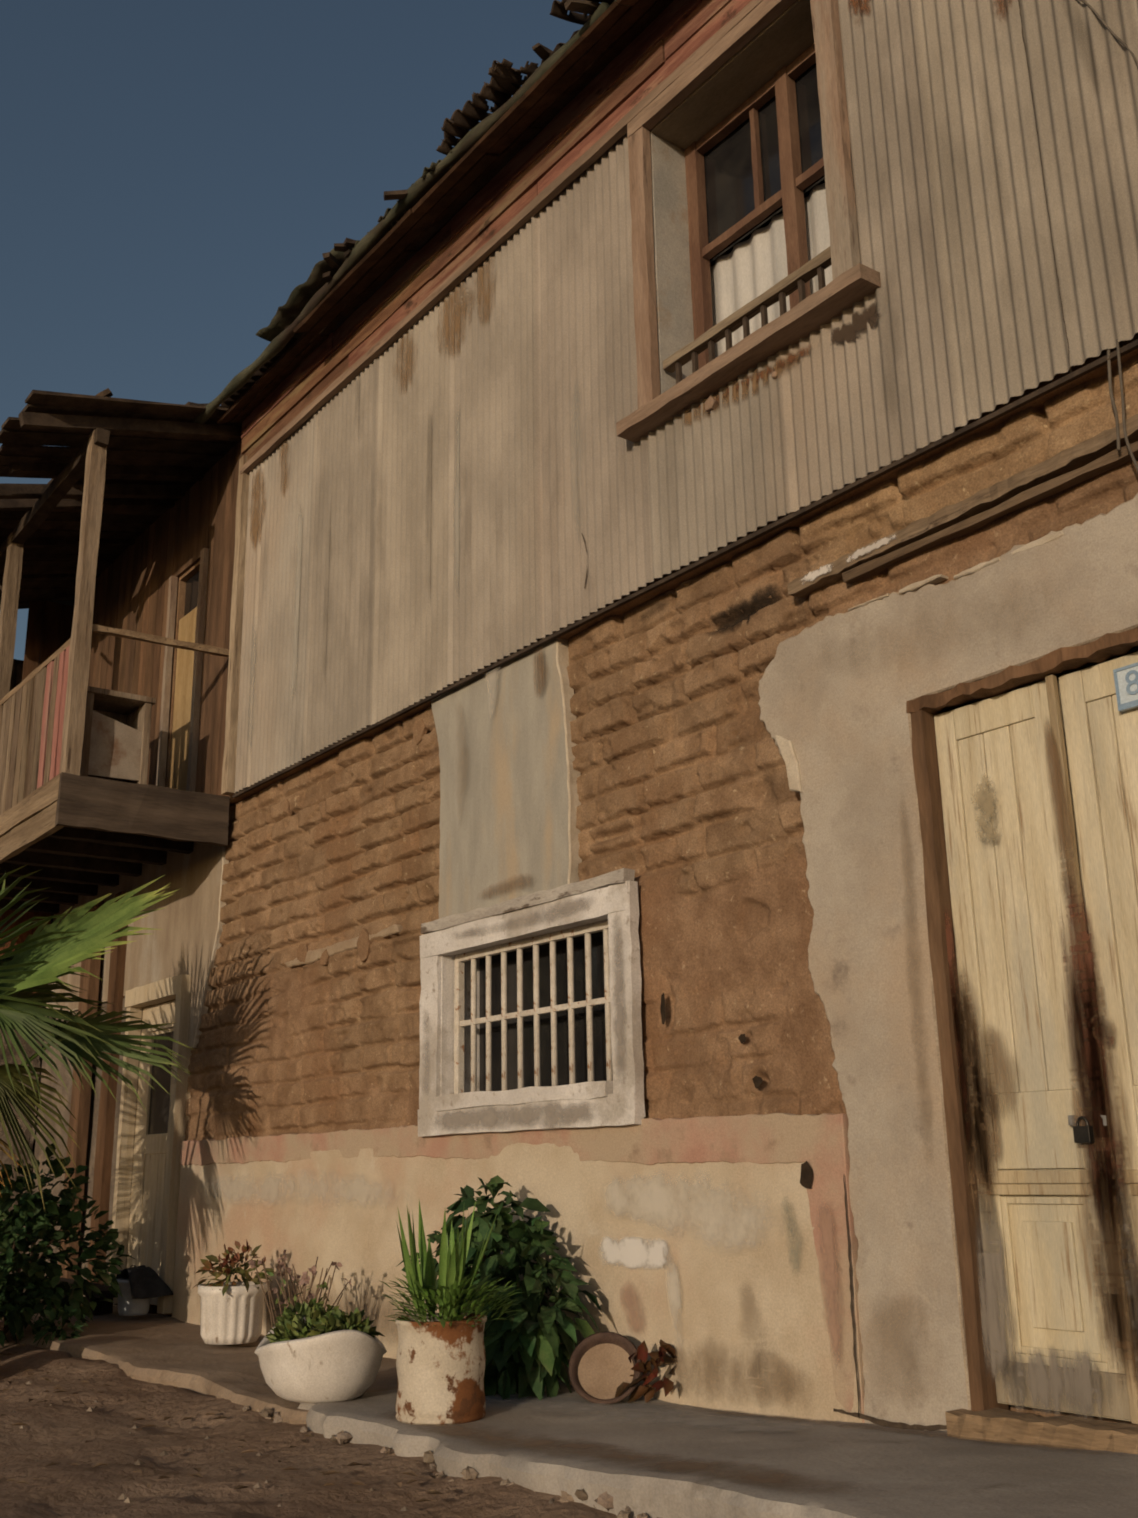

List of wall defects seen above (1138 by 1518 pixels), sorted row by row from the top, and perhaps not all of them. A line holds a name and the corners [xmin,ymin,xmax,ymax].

spalling [831,303,879,345]
crack [1018,0,1072,373]
spalling [567,348,1138,1119]
damp [1045,725,1138,1378]